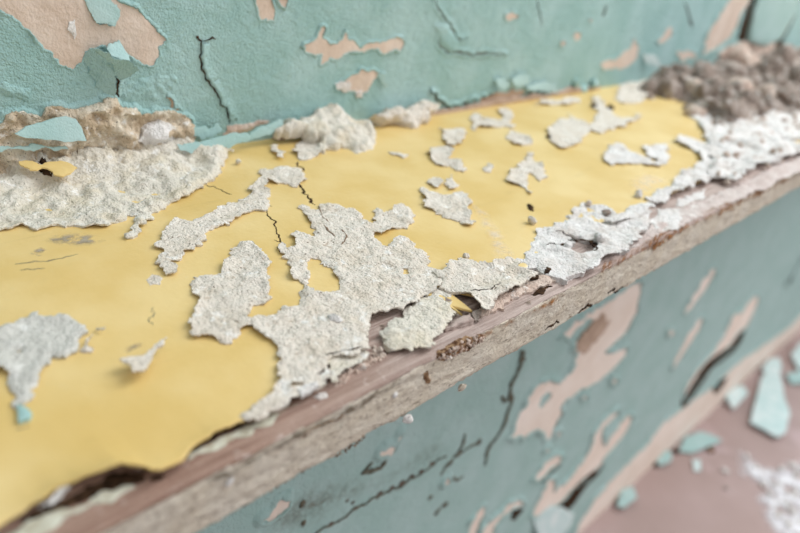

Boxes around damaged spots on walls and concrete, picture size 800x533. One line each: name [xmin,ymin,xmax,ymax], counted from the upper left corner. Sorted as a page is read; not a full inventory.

crack [196,36,237,123]
peeling [300,22,405,68]
peeling [333,66,389,100]
peeling [675,0,800,64]
peeling [0,0,322,286]
peeling [419,74,648,225]
crack [265,206,284,253]
peeling [188,110,800,445]
peeling [0,311,106,425]
peeling [120,337,167,373]
crack [316,350,526,533]
peeling [465,291,800,533]